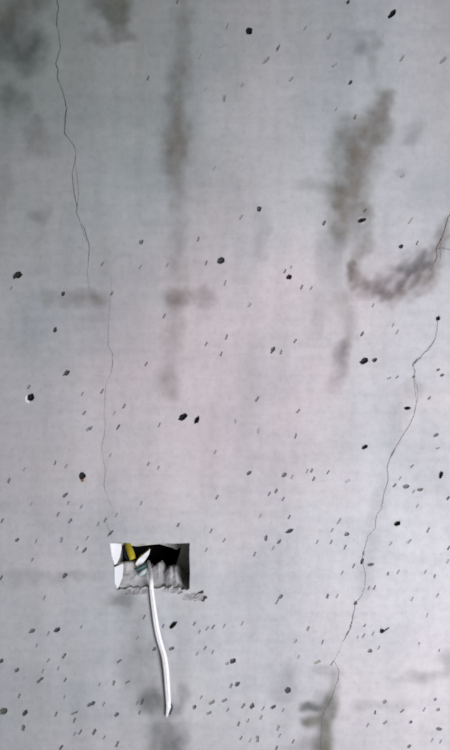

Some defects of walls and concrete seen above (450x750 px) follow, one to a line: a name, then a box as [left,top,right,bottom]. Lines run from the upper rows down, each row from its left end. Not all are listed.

crack [55,1,90,292]
crack [431,214,450,269]
crack [320,320,438,744]